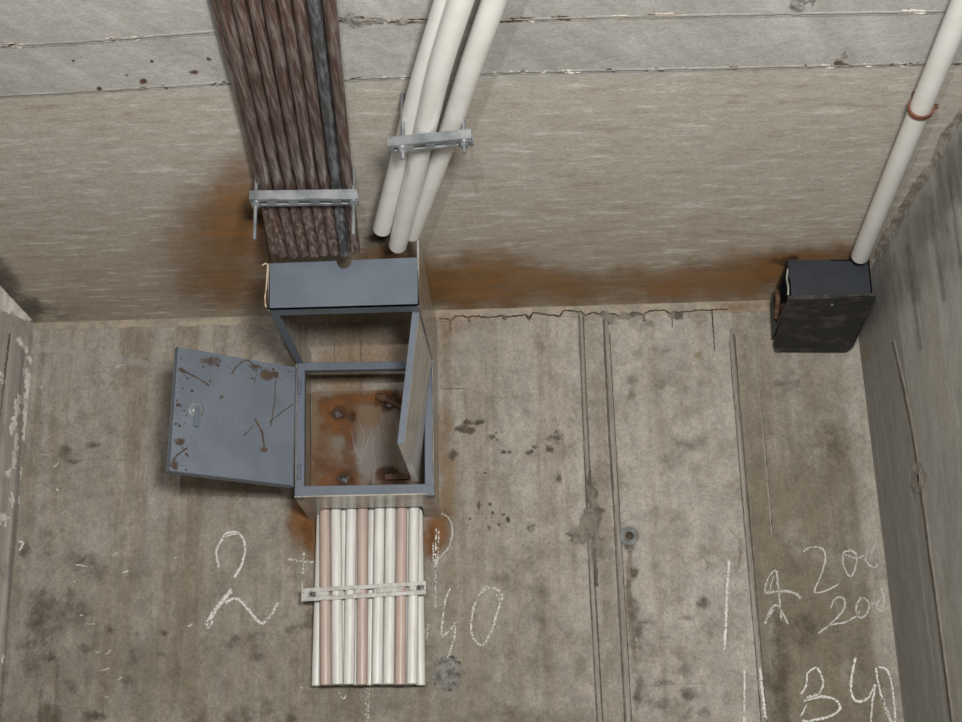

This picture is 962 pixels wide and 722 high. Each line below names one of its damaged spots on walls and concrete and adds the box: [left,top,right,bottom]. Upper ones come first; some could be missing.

corrosion [193,173,268,300]
corrosion [363,234,411,260]
corrosion [424,247,853,310]
crack [439,308,728,350]
peeling [5,337,43,480]
peeling [0,491,20,527]
corrosion [290,500,316,554]